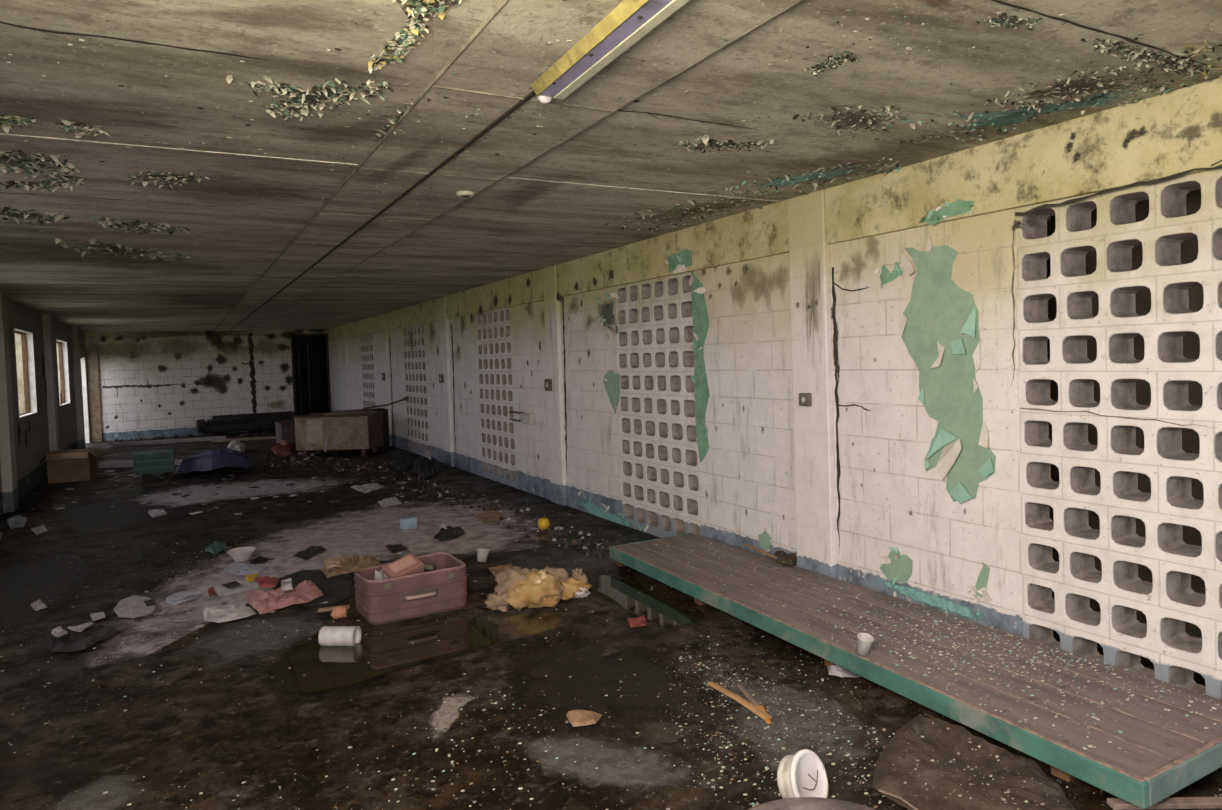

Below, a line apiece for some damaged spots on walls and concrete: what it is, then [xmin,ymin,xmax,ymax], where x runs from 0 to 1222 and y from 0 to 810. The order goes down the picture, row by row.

crack [991,0,1222,71]
damp [1066,133,1080,162]
damp [1122,127,1147,148]
damp [1177,114,1222,141]
damp [1012,215,1049,230]
peeling [580,293,619,340]
crack [1006,160,1222,428]
peeling [665,249,723,463]
peeling [874,199,996,514]
peeling [593,370,620,413]
crack [832,267,871,540]